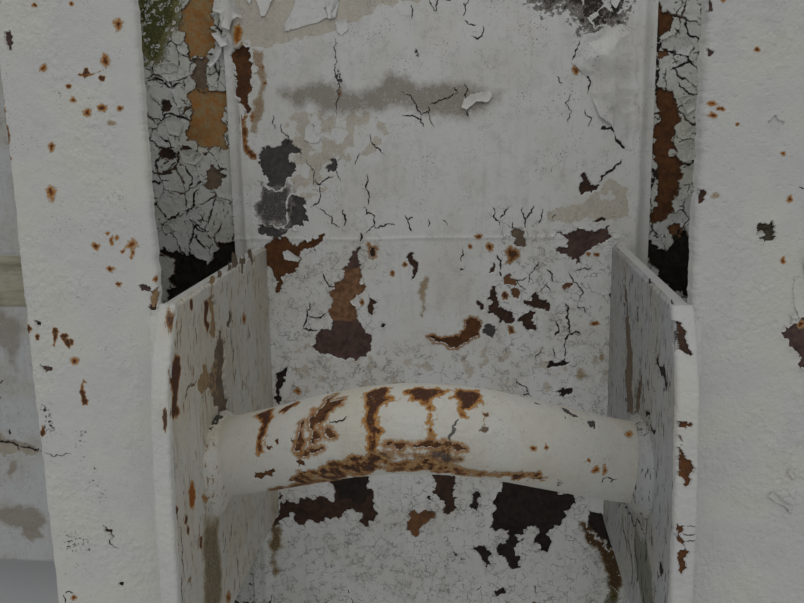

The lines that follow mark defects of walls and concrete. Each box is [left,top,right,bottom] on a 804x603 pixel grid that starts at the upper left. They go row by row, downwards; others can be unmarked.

crack [411,0,484,40]
rust [77,53,110,82]
leakage [283,69,483,116]
crack [141,0,235,304]
crack [306,136,447,242]
peeling [309,242,379,361]
peeling [425,273,550,350]
rust [162,354,181,434]
rust [254,386,302,457]
rust [268,386,548,491]
peeling [273,476,378,528]
peeling [469,472,576,569]